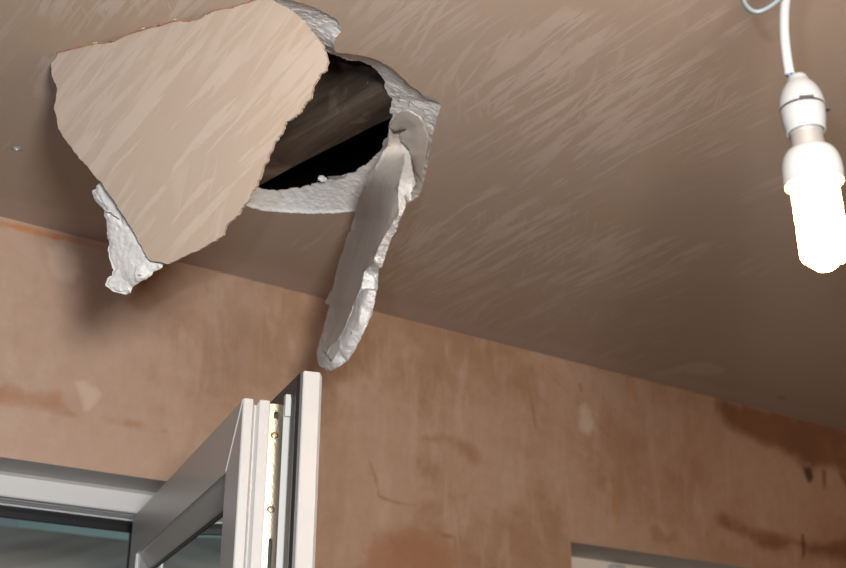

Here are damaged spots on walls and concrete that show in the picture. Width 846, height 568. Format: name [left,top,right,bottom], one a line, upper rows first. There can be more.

damp [708,397,846,493]
damp [708,505,846,568]